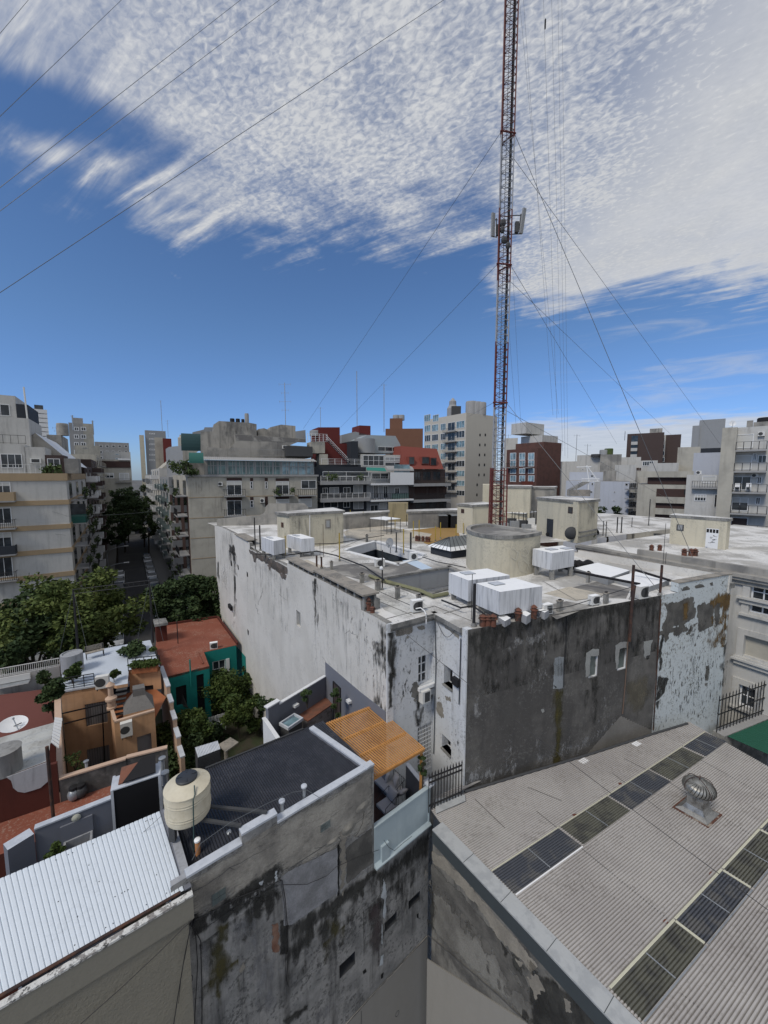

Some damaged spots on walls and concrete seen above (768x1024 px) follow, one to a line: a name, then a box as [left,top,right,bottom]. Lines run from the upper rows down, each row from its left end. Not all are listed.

water stain [217,545,237,601]
water stain [351,613,433,726]
spalling [410,682,419,702]
peeling [436,696,451,718]
peeling [656,582,723,709]
water stain [192,866,282,964]
water stain [283,833,595,1024]
peeling [432,851,545,1000]